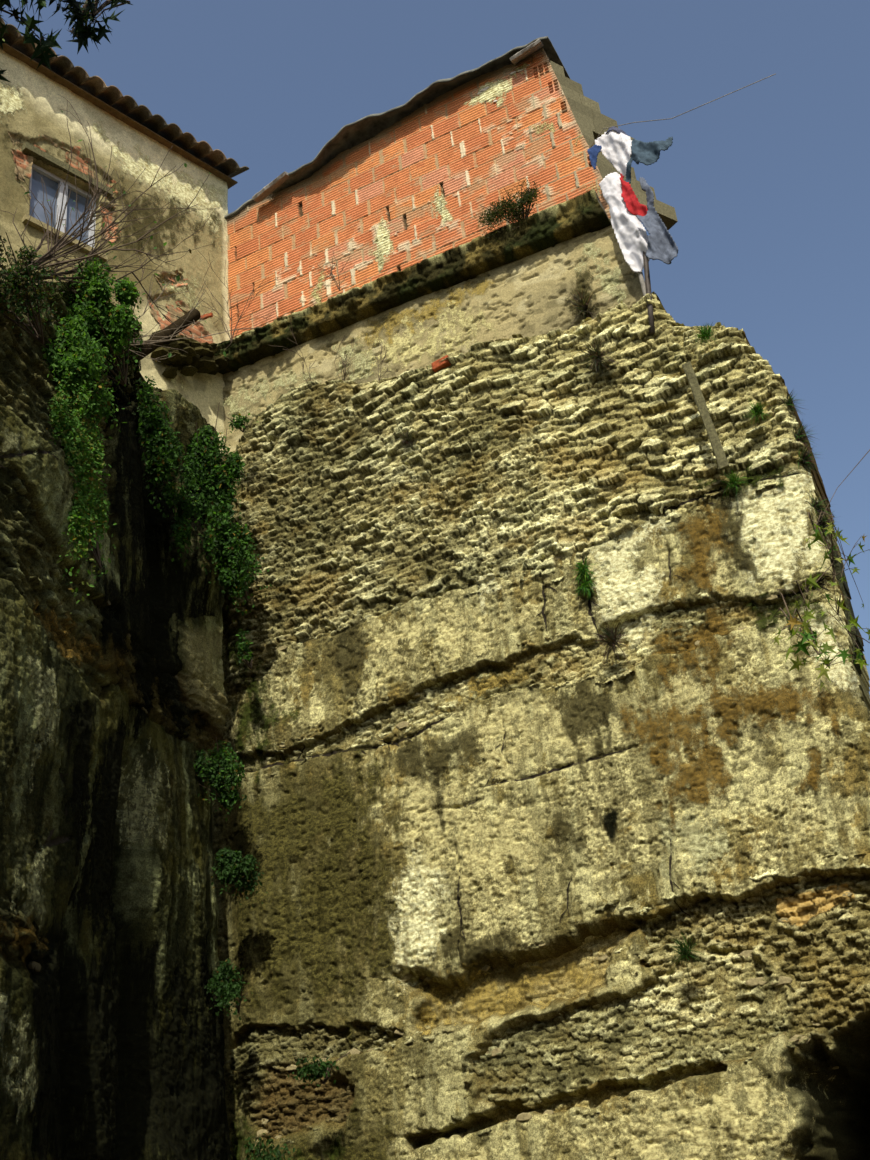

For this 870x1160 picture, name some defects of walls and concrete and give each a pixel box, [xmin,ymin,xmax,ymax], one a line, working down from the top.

crack [534,556,608,644]
crack [668,549,685,585]
crack [763,576,831,602]
leakage [0,350,239,1160]
crack [426,719,635,813]
leakage [233,673,618,1045]
crack [456,848,467,967]
crack [559,873,572,925]
crack [668,824,691,917]
leakage [266,1099,500,1160]